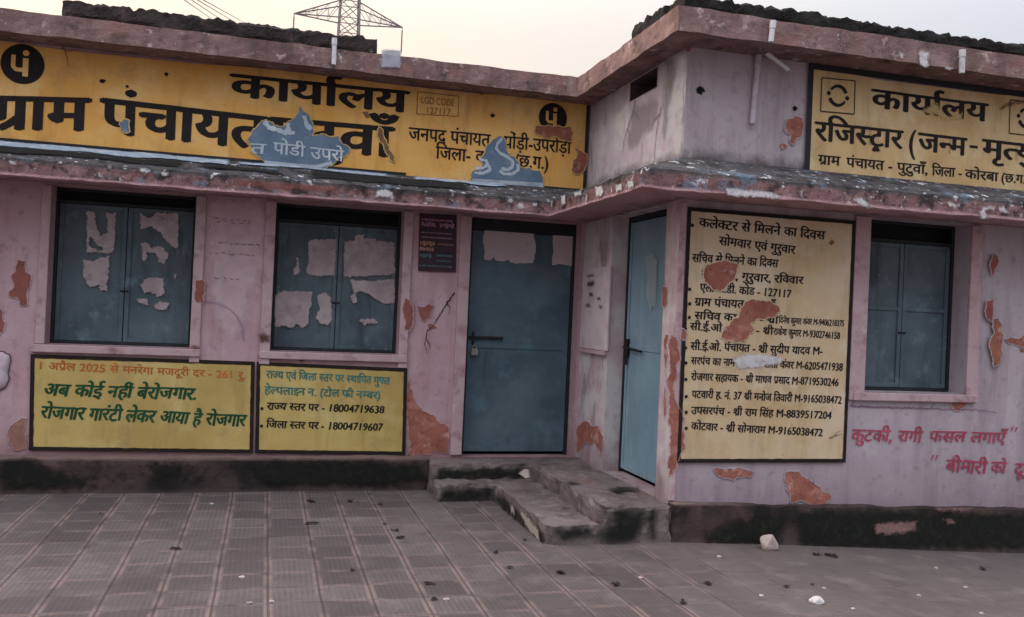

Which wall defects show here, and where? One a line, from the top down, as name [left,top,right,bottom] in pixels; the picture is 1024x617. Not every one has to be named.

peeling [246,106,351,169]
peeling [470,135,544,187]
peeling [780,106,805,150]
peeling [8,259,33,307]
peeling [402,297,436,332]
crack [424,292,455,351]
peeling [720,298,781,344]
peeling [984,299,1024,367]
peeling [406,381,450,456]
peeling [576,420,604,457]
peeling [663,328,688,477]
peeling [784,470,832,505]